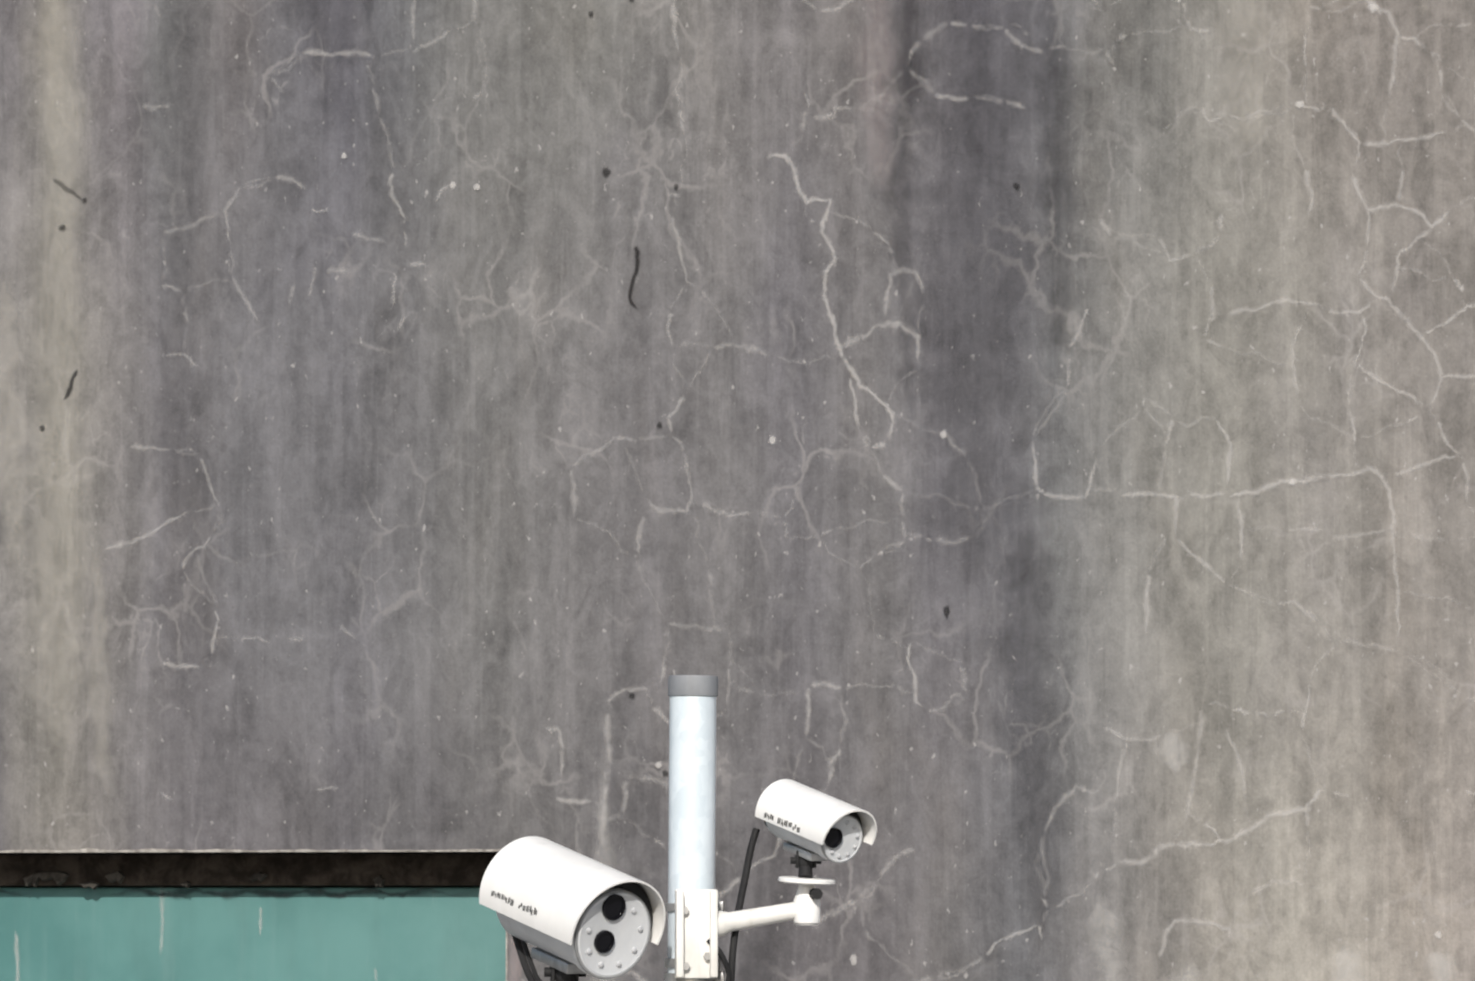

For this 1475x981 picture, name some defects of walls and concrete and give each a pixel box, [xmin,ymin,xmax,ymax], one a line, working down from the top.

crack [628,246,639,307]
crack [65,370,77,398]